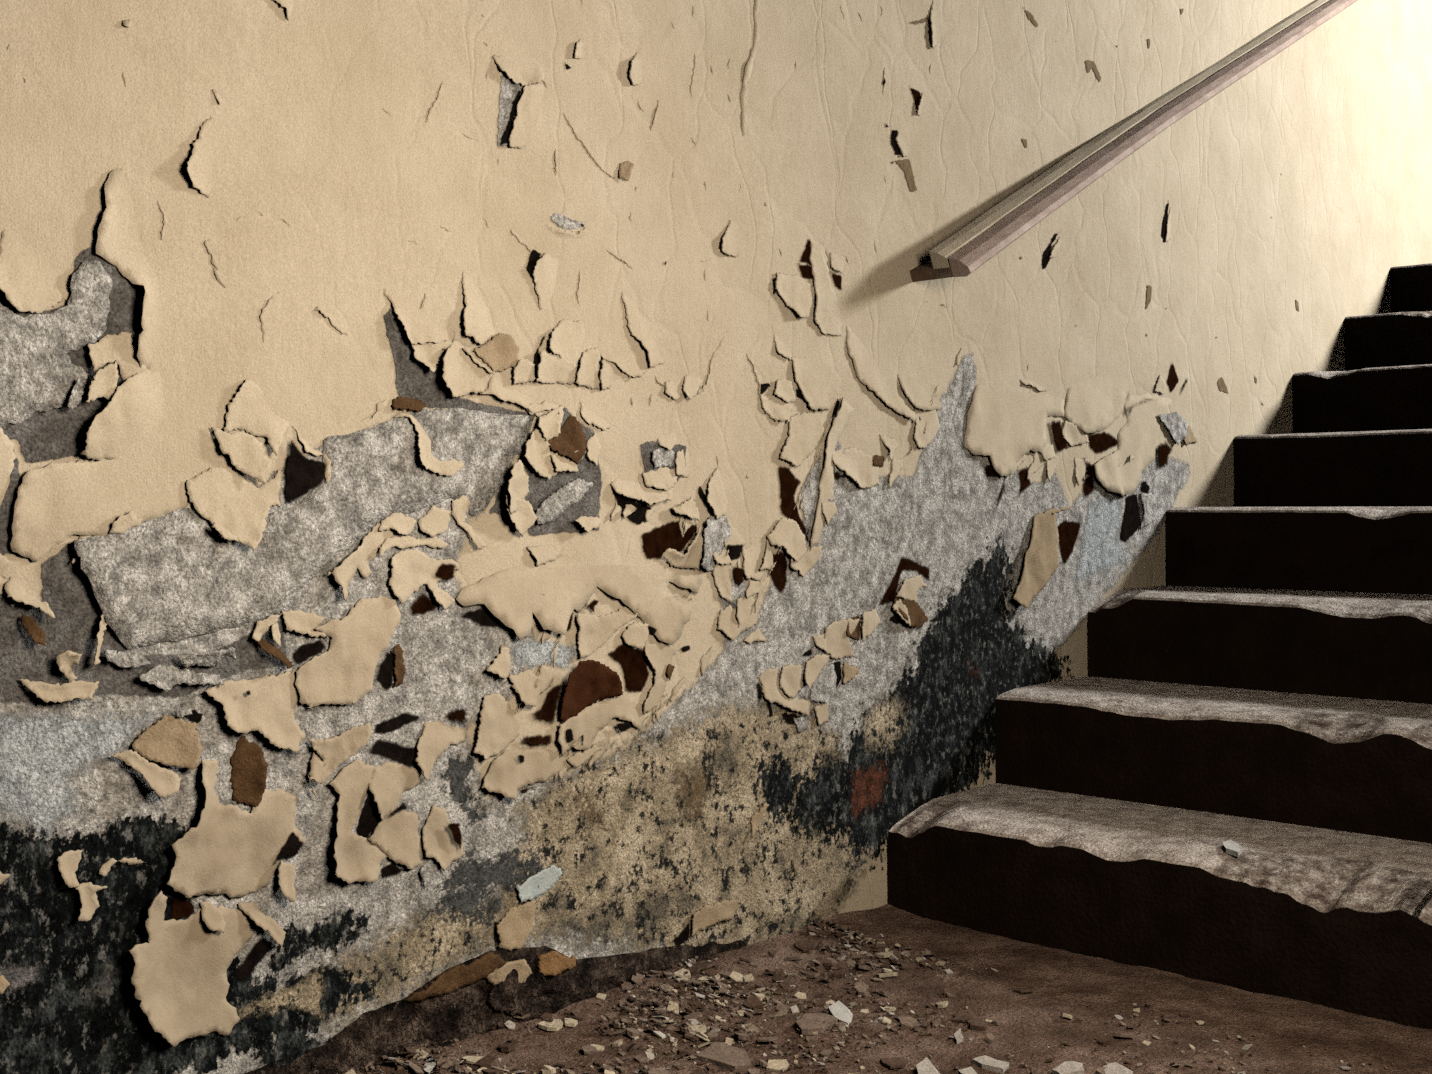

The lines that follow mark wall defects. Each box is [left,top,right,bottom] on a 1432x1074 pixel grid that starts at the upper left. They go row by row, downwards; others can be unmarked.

peeling [187,89,223,198]
crack [408,39,637,271]
crack [629,0,760,137]
crack [672,172,767,262]
crack [779,239,877,265]
crack [840,0,940,192]
flaking render [0,168,1198,1074]
mould [749,533,1079,875]
leakage [0,706,380,1074]
leakage [433,750,544,928]